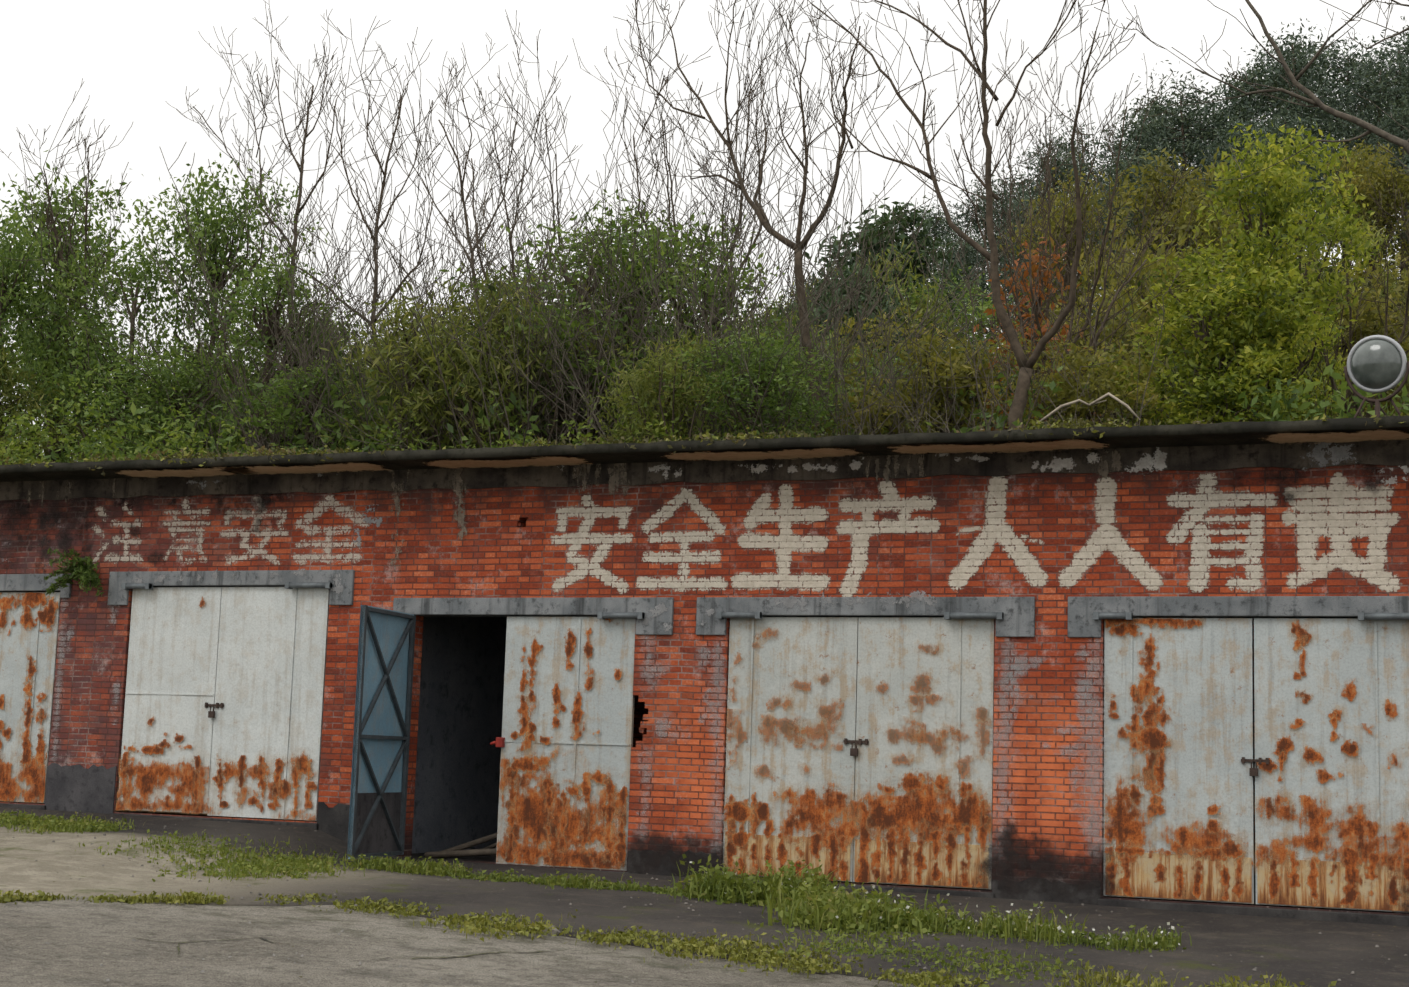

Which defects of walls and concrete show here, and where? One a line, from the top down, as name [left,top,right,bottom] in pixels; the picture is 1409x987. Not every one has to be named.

corrosion [0,656,47,803]
corrosion [0,592,59,635]
corrosion [116,717,317,821]
corrosion [496,618,628,869]
corrosion [727,628,844,770]
corrosion [723,674,991,888]
corrosion [918,644,939,654]
corrosion [1104,618,1409,907]